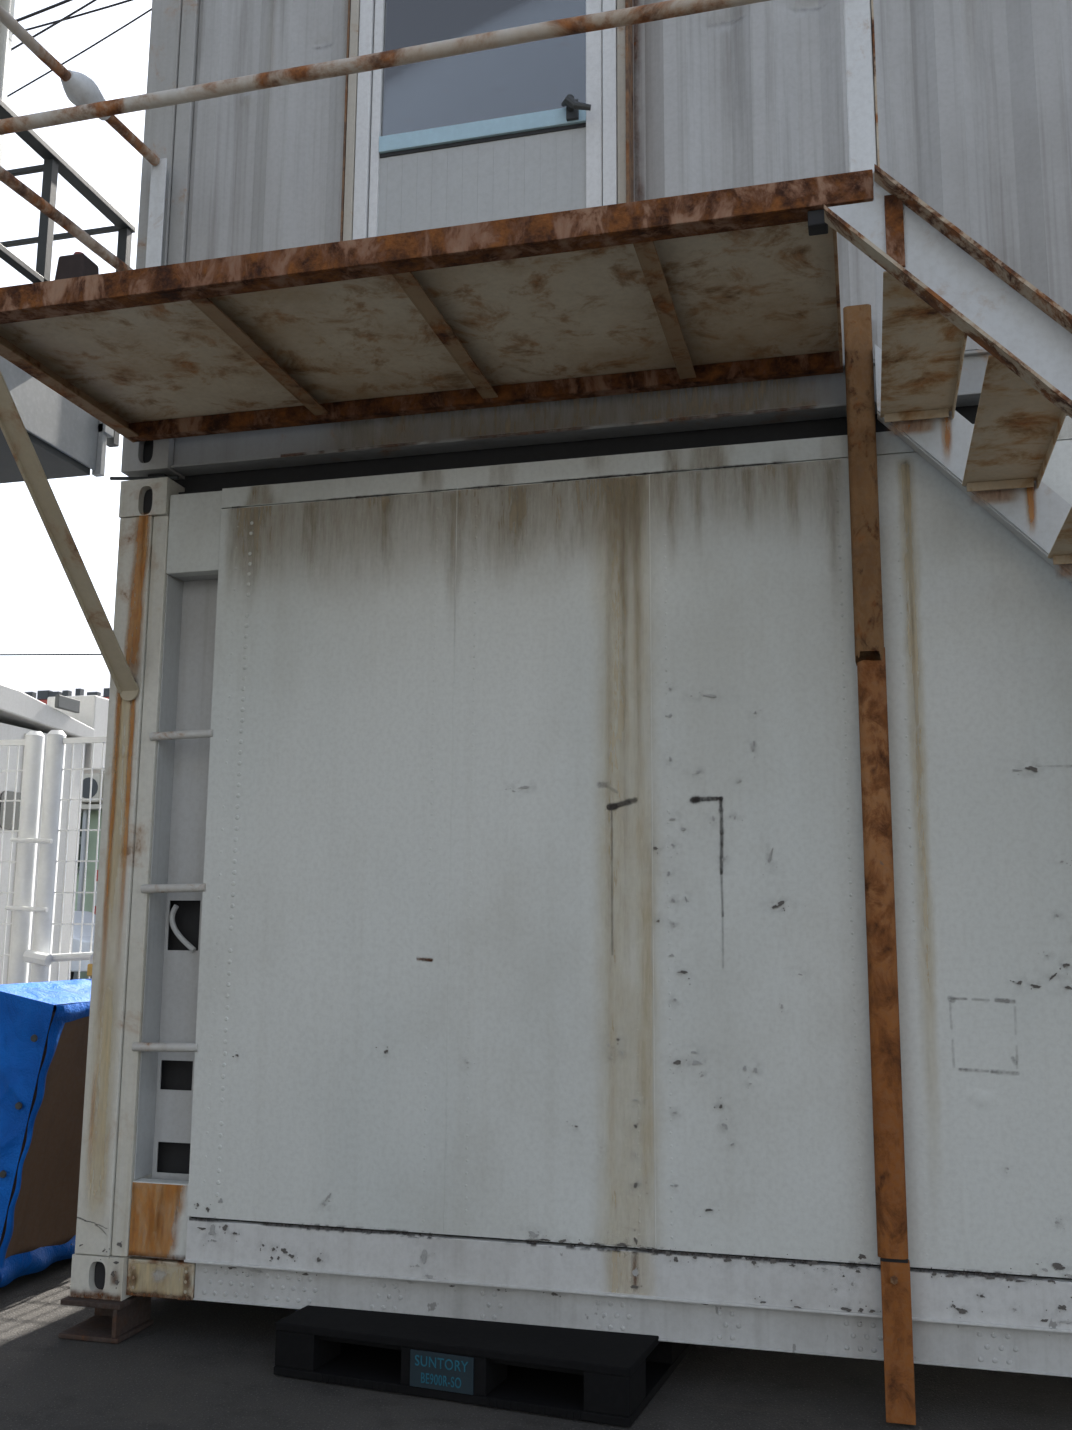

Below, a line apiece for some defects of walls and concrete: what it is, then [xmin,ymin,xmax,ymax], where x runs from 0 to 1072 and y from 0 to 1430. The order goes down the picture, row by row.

corrosion [126,514,149,667]
corrosion [105,693,135,922]
corrosion [70,1182,191,1301]
peeling [194,1198,237,1246]
peeling [221,1244,322,1276]
peeling [529,1230,881,1323]
peeling [931,1262,1072,1318]